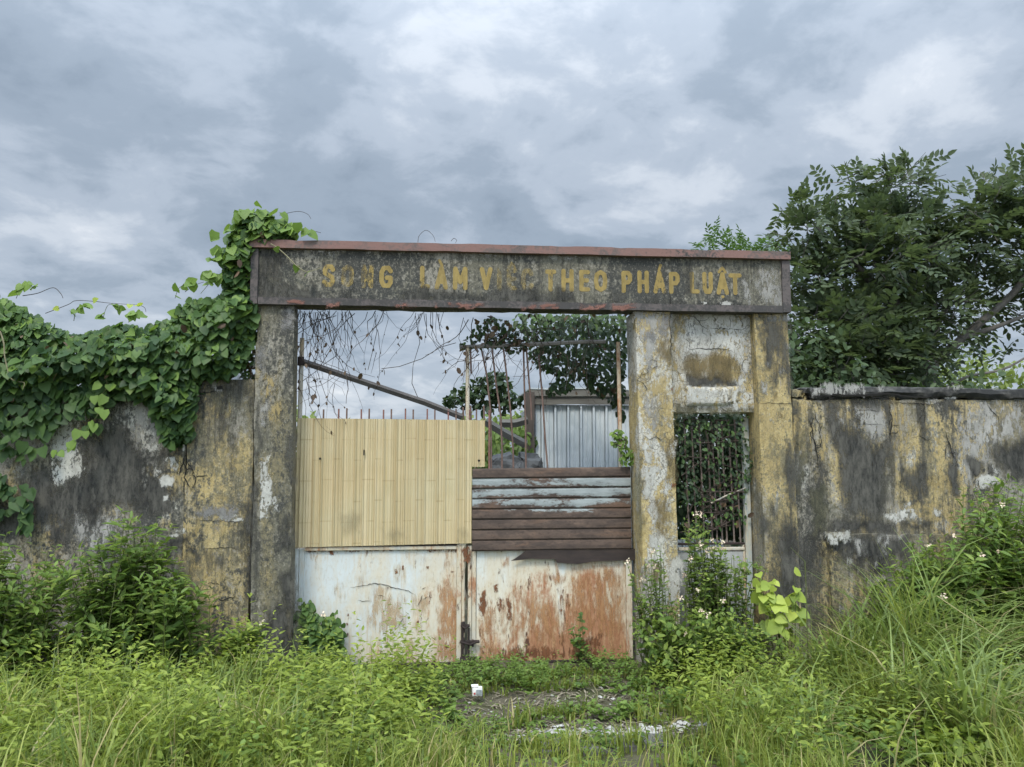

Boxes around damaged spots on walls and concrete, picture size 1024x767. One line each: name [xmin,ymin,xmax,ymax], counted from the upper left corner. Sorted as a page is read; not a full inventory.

leakage [644,262,740,387]
peeling [2,407,89,486]
leakage [0,419,176,547]
leakage [195,483,258,599]
peeling [259,455,278,518]
leakage [633,447,670,535]
peeling [580,301,750,549]
peeling [667,555,684,606]
peeling [823,530,861,564]
leakage [758,396,930,598]
peeling [885,472,953,525]
leakage [948,430,1024,497]